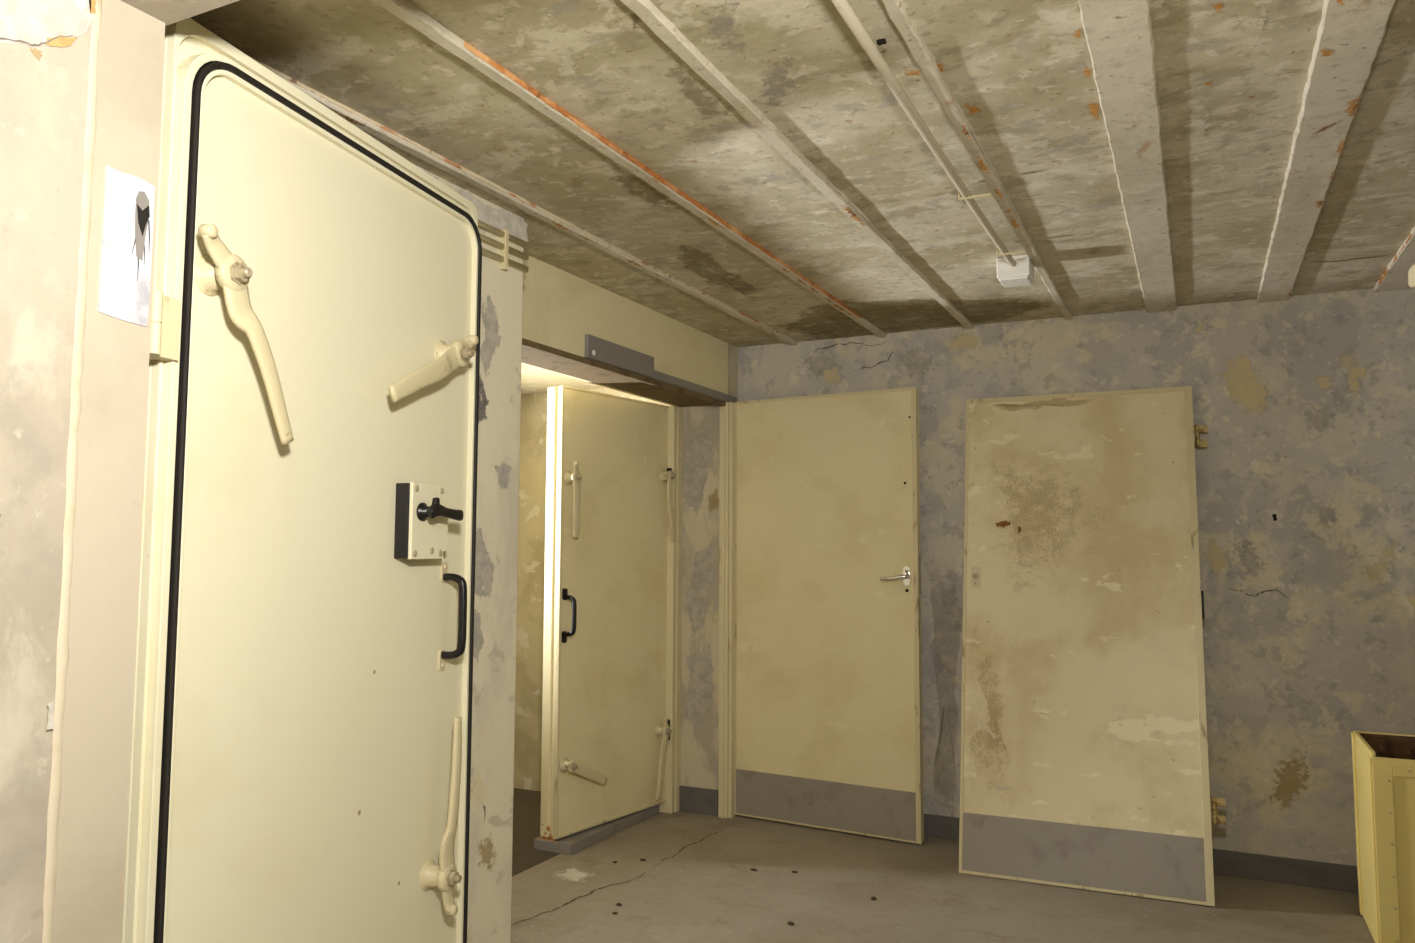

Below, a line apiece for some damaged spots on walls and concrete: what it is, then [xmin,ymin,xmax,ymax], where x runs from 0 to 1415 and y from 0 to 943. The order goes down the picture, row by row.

peeling [0,0,96,61]
rust [247,55,782,336]
rust [464,41,861,318]
peeling [495,461,512,489]
crack [511,829,722,925]